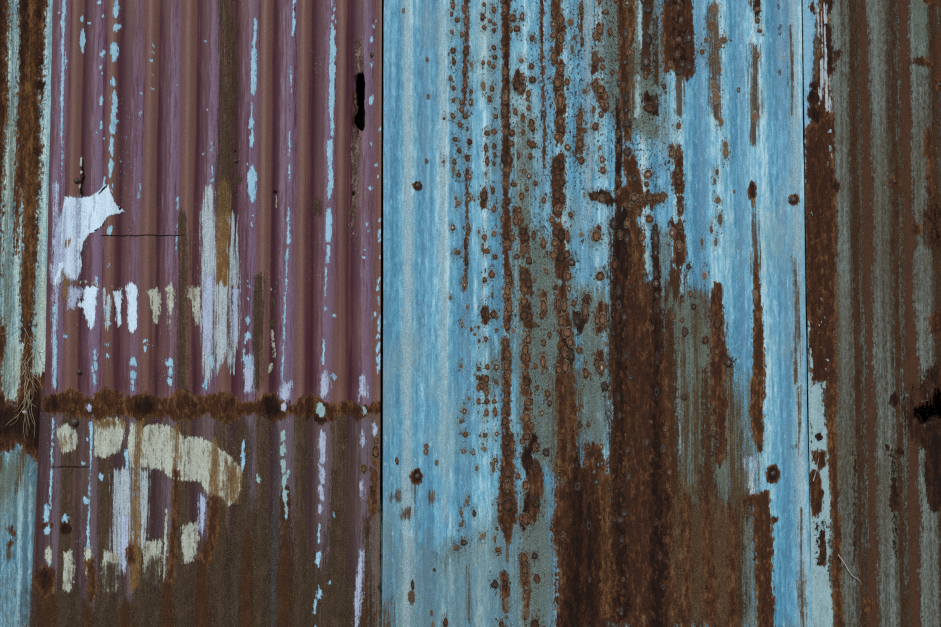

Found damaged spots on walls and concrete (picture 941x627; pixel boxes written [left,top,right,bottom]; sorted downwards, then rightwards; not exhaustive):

peeling [52,0,67,253]
peeling [96,0,122,193]
peeling [50,284,67,390]
peeling [92,343,110,385]
peeling [129,339,148,387]
peeling [165,357,175,386]
corrosion [0,0,391,627]
corrosion [441,0,781,627]
corrosion [787,0,941,627]
peeling [44,417,54,535]
peeling [81,421,104,548]